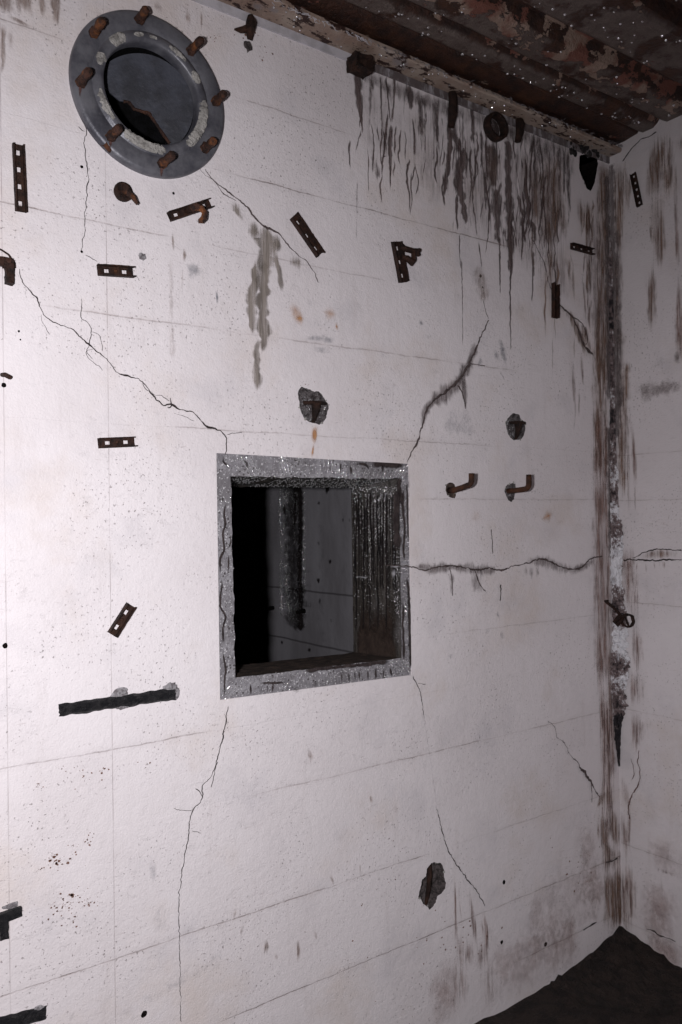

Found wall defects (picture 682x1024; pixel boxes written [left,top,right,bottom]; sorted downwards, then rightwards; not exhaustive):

crack [205,169,318,282]
crack [19,269,242,454]
water stain [247,225,283,387]
spalling [298,381,329,425]
crack [407,301,489,462]
spalling [505,413,526,441]
water stain [348,75,639,923]
crack [385,548,681,596]
crack [548,721,600,797]
crack [174,710,228,1021]
spalling [413,862,446,914]
crack [437,810,485,906]